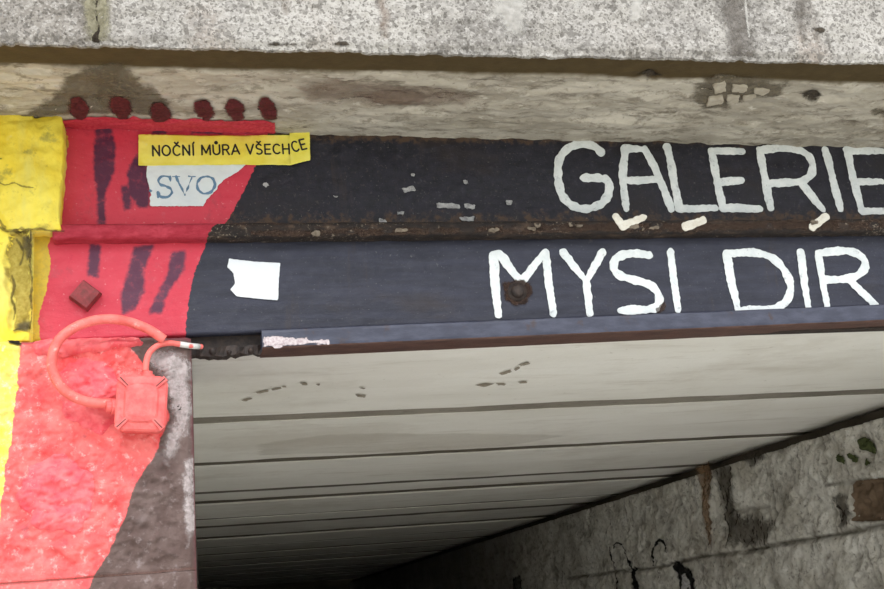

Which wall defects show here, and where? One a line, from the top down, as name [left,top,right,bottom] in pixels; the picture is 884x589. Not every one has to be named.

crack [92,0,100,42]
peeling [693,75,786,109]
crack [0,220,64,234]
rust [474,219,884,236]
rust [503,280,533,306]
rust [696,463,712,544]